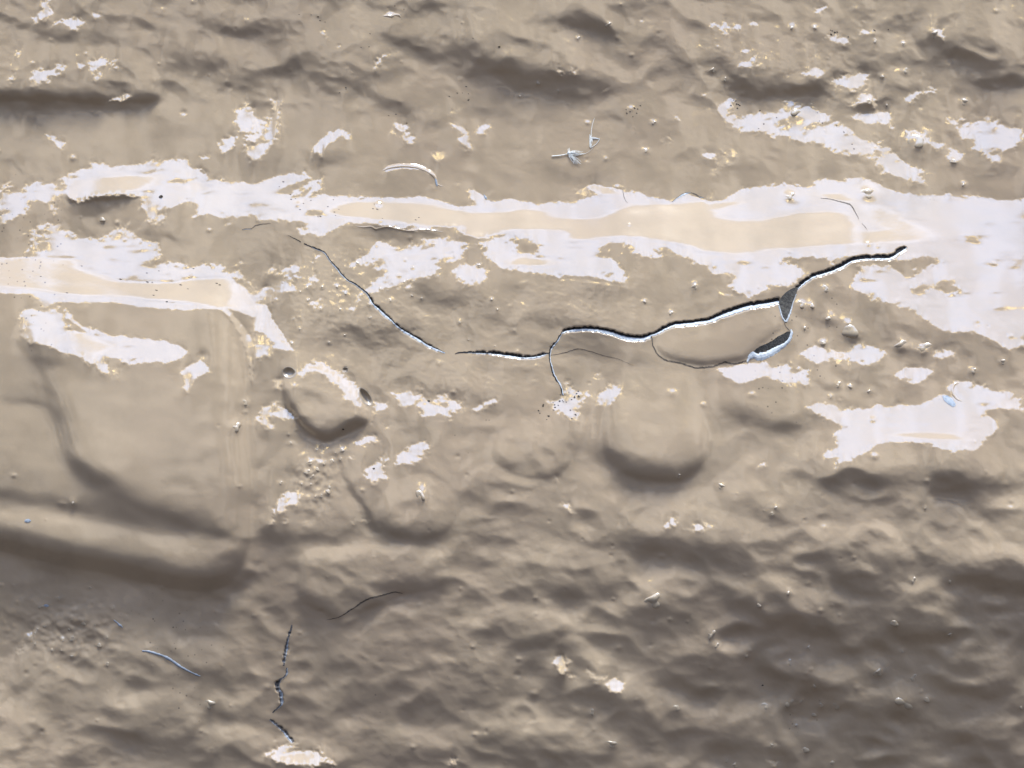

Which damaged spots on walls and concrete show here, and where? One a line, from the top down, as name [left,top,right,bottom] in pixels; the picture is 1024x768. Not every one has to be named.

crack [242,223,907,395]
peeling [656,287,798,365]
crack [269,625,294,743]